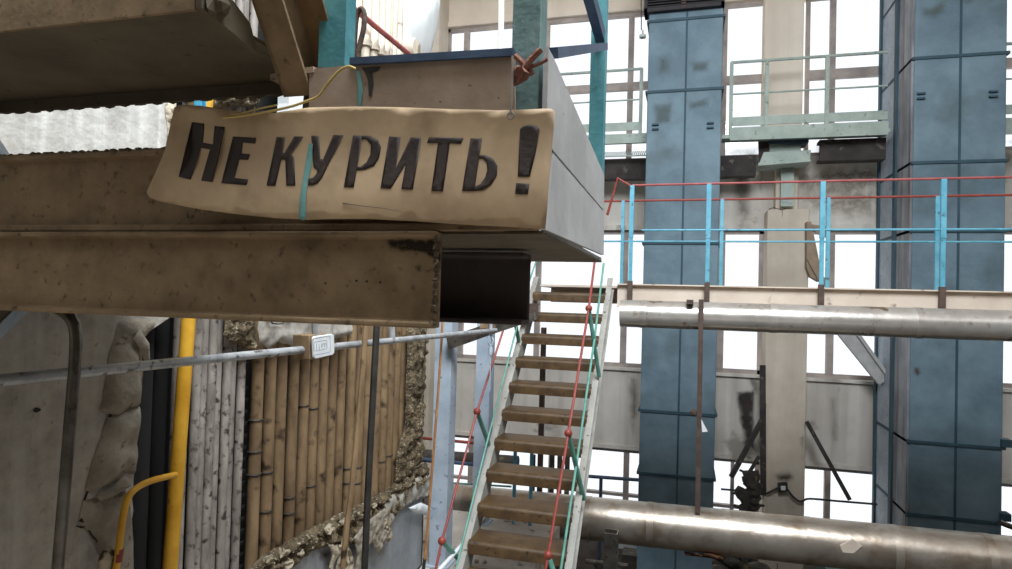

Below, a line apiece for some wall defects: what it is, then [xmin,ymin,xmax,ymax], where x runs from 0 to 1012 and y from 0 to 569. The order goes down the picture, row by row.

flaking render [258,321,353,349]
peeling [78,318,157,569]
flaking render [378,474,431,521]